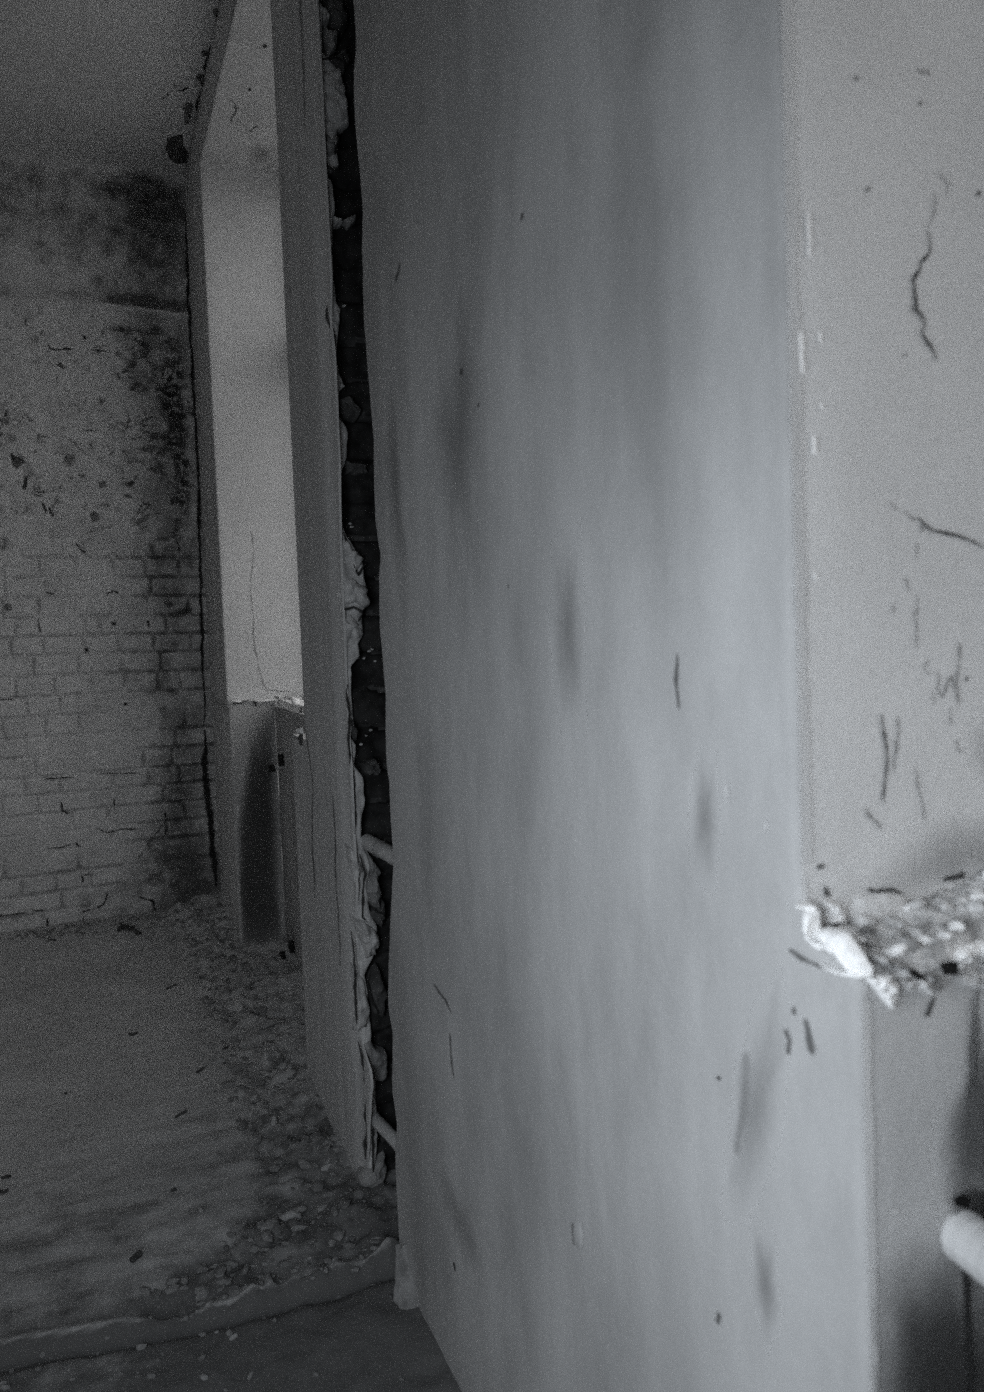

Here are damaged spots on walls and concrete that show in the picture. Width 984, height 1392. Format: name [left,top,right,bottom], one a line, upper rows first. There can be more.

crack [910,172,952,360]
damp [160,361,187,503]
crack [891,502,984,753]
crack [865,714,925,830]
flaking render [796,892,984,1009]
damp [960,988,984,1177]